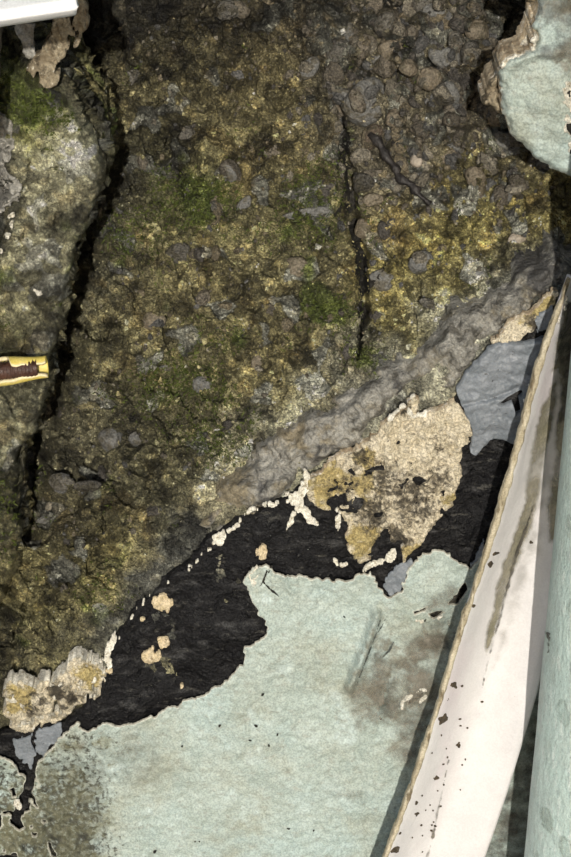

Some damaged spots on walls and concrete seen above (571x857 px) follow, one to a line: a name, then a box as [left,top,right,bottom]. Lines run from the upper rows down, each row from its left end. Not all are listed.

peeling [14,0,90,88]
spalling [348,89,366,114]
peeling [477,59,502,114]
peeling [495,0,539,69]
peeling [562,81,571,154]
peeling [0,111,22,254]
crack [327,117,386,360]
water stain [486,303,571,652]
peeling [0,284,563,829]
water stain [356,635,454,762]
water stain [499,717,537,857]